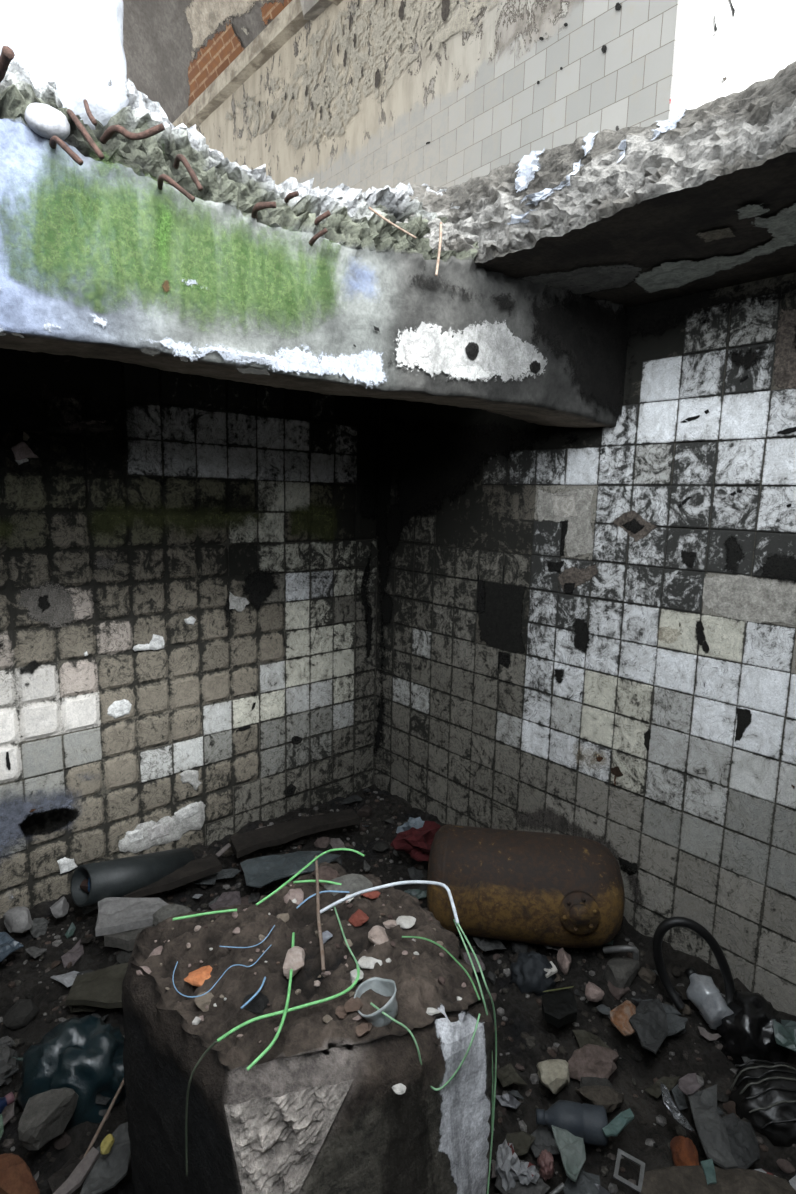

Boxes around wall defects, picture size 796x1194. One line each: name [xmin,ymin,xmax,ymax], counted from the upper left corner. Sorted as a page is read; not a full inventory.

spalling [0,46,15,83]
flaking render [183,0,292,107]
peeling [225,0,502,153]
spalling [66,99,165,160]
spalling [251,191,299,220]
peeling [516,203,796,295]
leakage [139,336,387,389]
flaking render [388,318,548,382]
peeling [472,566,526,684]
peeling [702,575,796,625]
spalling [57,857,78,874]
spalling [224,1079,354,1194]